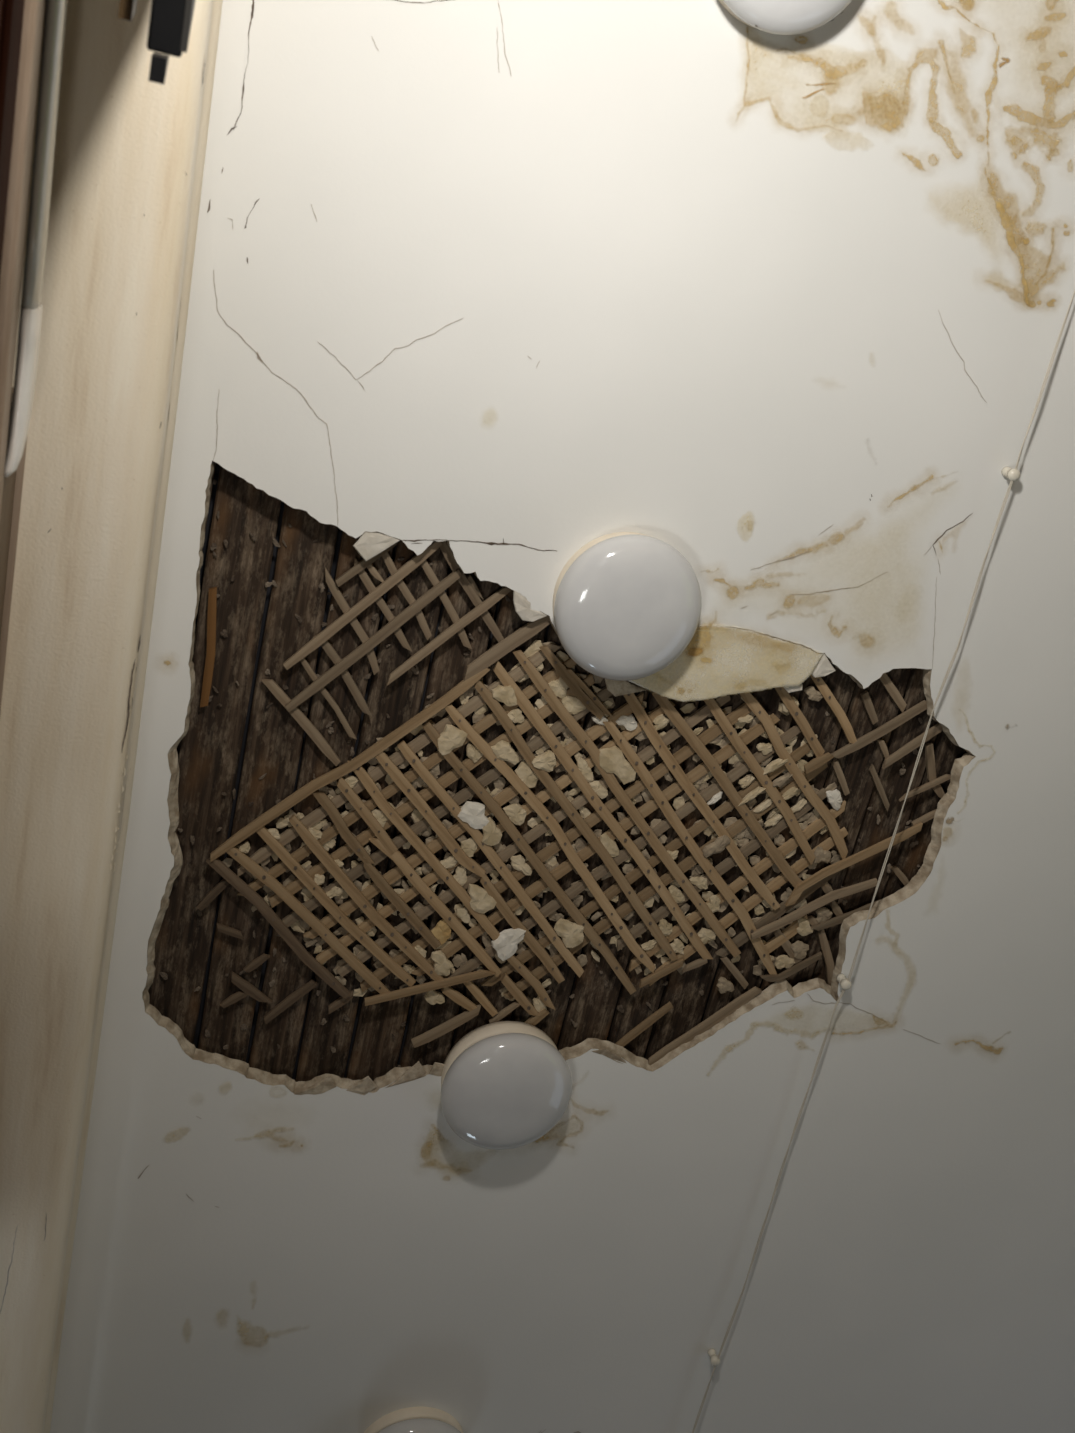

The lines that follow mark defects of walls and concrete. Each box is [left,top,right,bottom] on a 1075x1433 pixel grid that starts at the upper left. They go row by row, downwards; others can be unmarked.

crack [227,0,254,135]
crack [497,2,511,74]
water stain [795,36,844,98]
water stain [870,45,962,169]
water stain [981,47,1075,201]
crack [207,169,259,264]
water stain [985,172,1069,307]
crack [213,271,338,526]
crack [318,318,463,389]
water stain [636,626,793,697]
flaking render [142,461,976,1095]